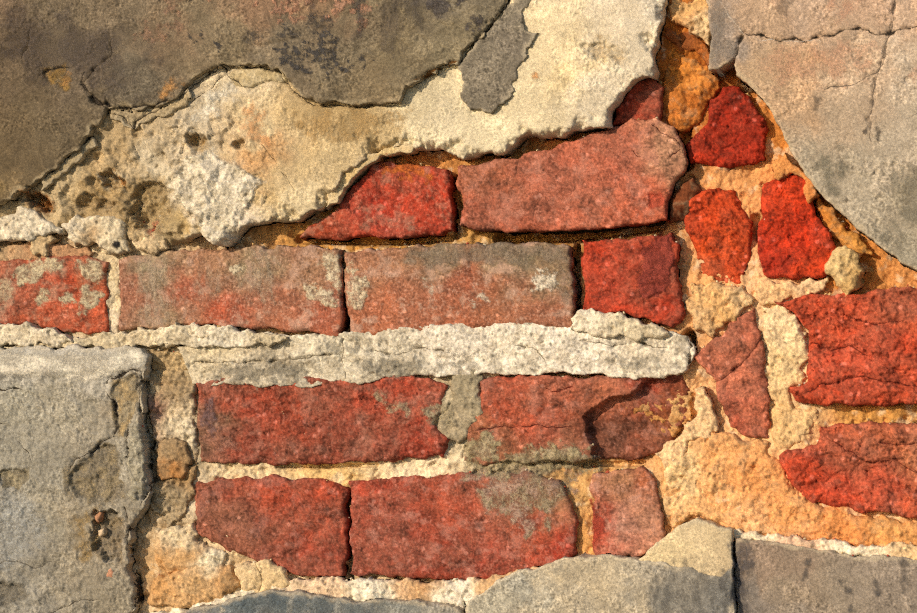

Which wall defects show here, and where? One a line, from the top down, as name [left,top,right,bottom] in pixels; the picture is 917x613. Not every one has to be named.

spalling [191,65,289,122]
crack [722,0,917,141]
spalling [167,150,262,243]
flaking render [0,206,173,257]
spalling [635,233,676,298]
spalling [0,468,29,490]
crack [69,369,158,545]
spalling [64,349,199,528]
spalling [626,390,693,437]
spalling [662,432,917,547]
spalling [590,499,605,546]
crack [132,570,144,610]